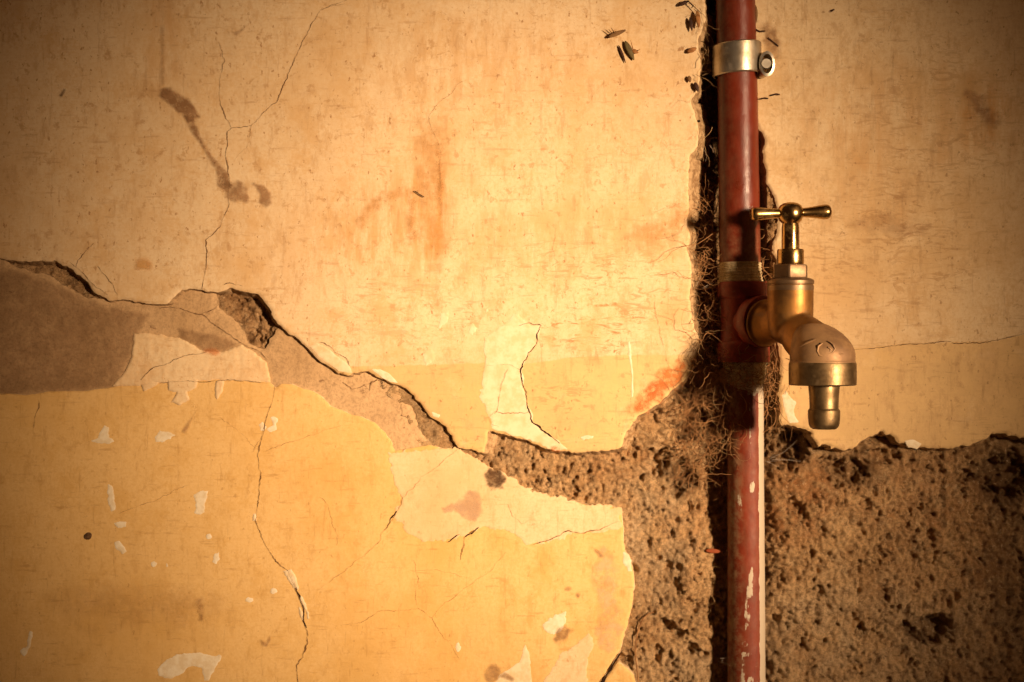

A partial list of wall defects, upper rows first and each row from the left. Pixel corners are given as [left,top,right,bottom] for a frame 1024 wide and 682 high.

leakage [161,89,270,204]
crack [161,3,338,357]
crack [149,352,309,679]
spalling [0,259,728,682]
crack [497,323,557,441]
rust [637,363,685,410]
spalling [763,343,1024,682]